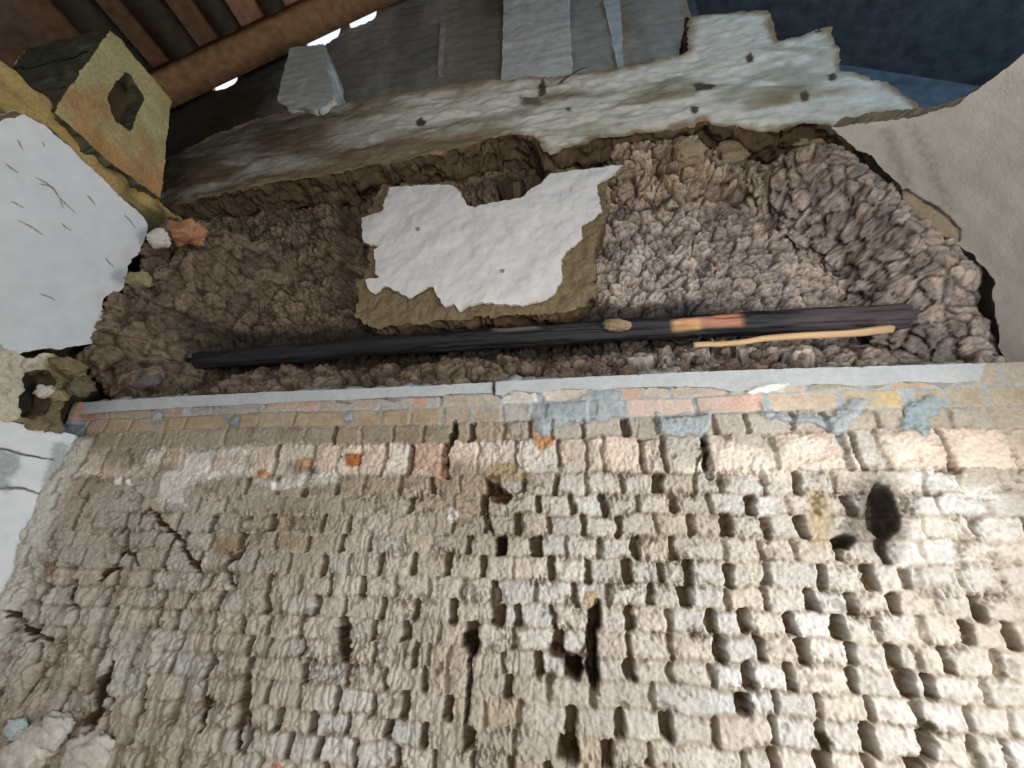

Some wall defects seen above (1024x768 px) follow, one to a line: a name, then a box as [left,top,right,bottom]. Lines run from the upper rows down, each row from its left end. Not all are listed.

spalling [671,136,751,169]
spalling [166,218,209,248]
spalling [123,271,153,289]
crack [138,507,201,569]